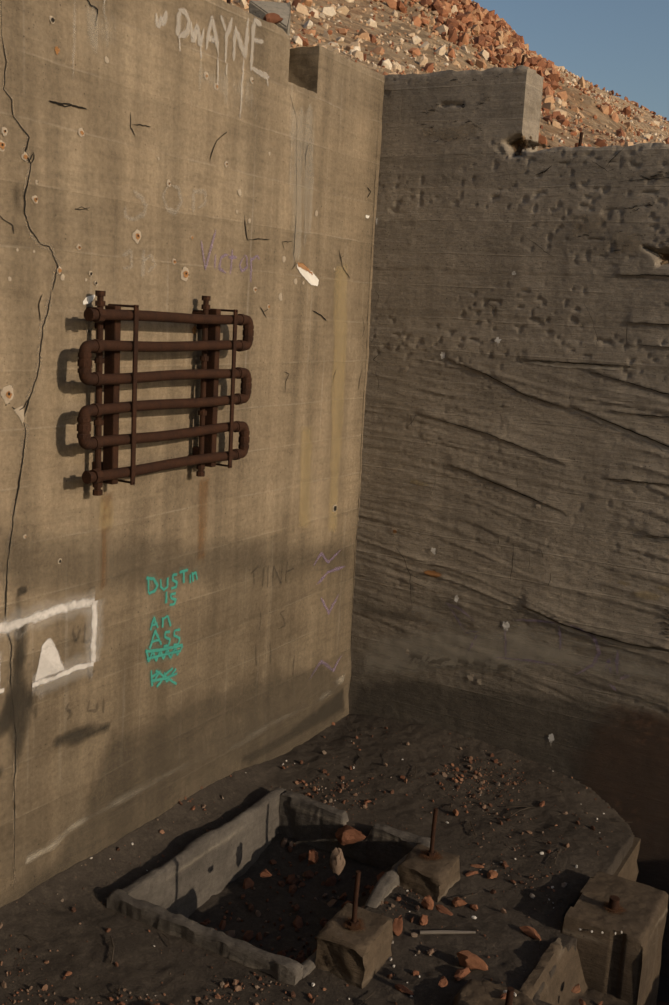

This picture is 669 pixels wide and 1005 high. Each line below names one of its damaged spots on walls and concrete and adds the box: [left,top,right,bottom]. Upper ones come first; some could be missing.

crack [49,100,86,109]
peeling [294,263,319,286]
crack [459,301,669,452]
crack [0,5,58,888]
crack [456,467,562,512]
crack [524,608,669,653]